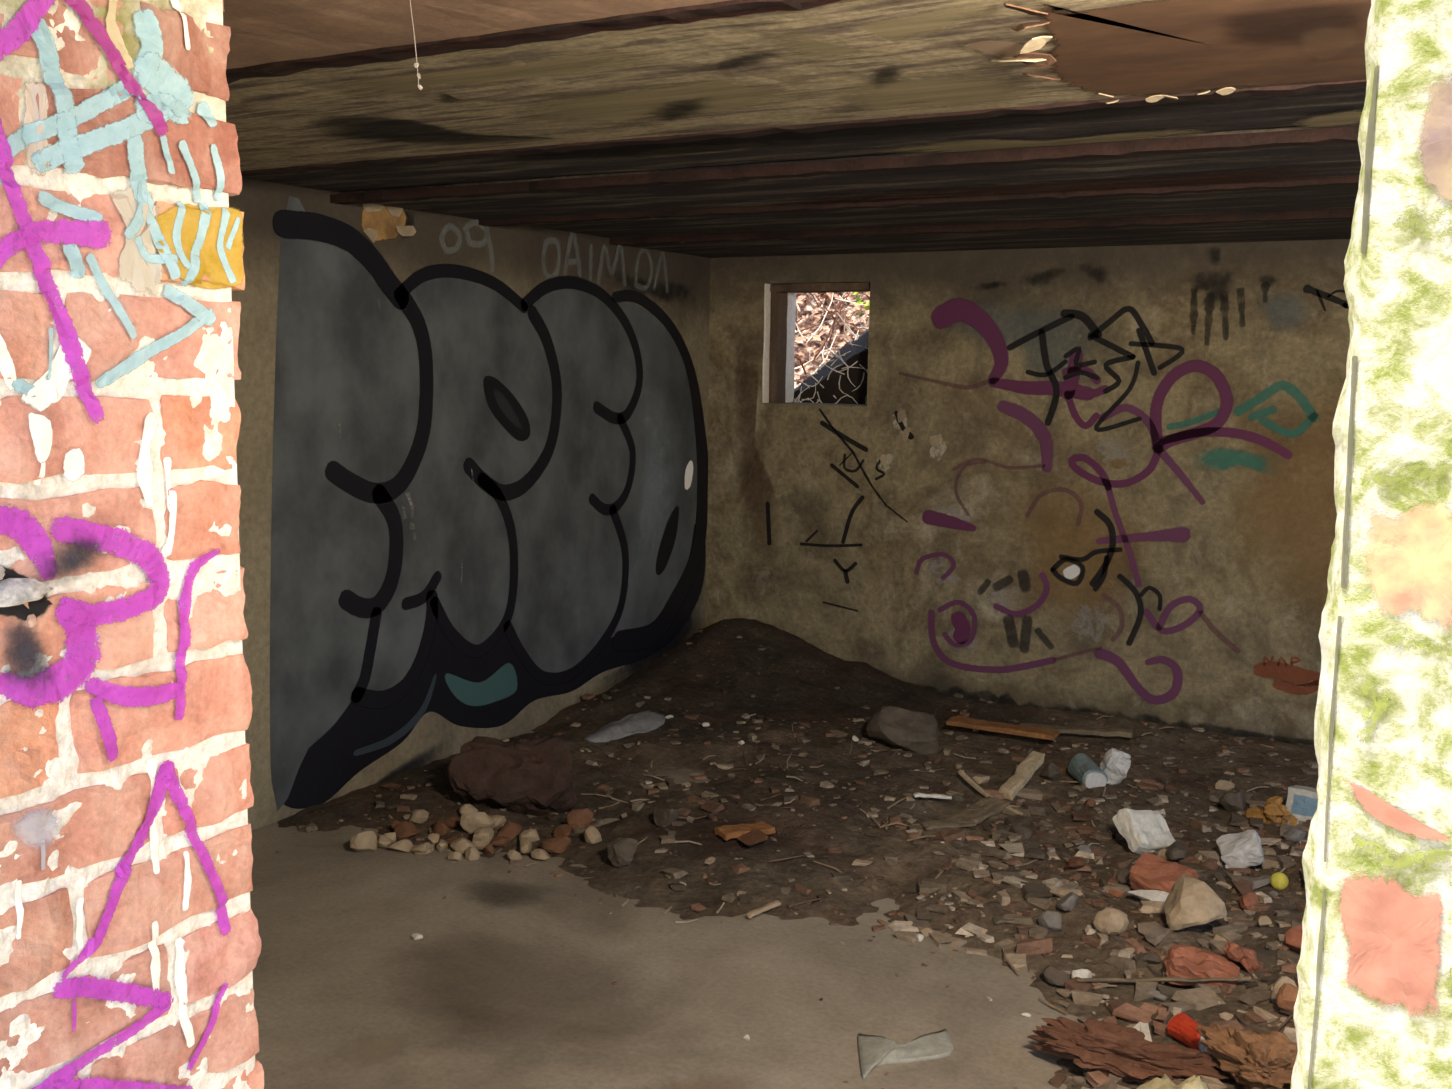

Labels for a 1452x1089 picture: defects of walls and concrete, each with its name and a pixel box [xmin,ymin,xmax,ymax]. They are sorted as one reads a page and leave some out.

spalling [962,0,1371,104]